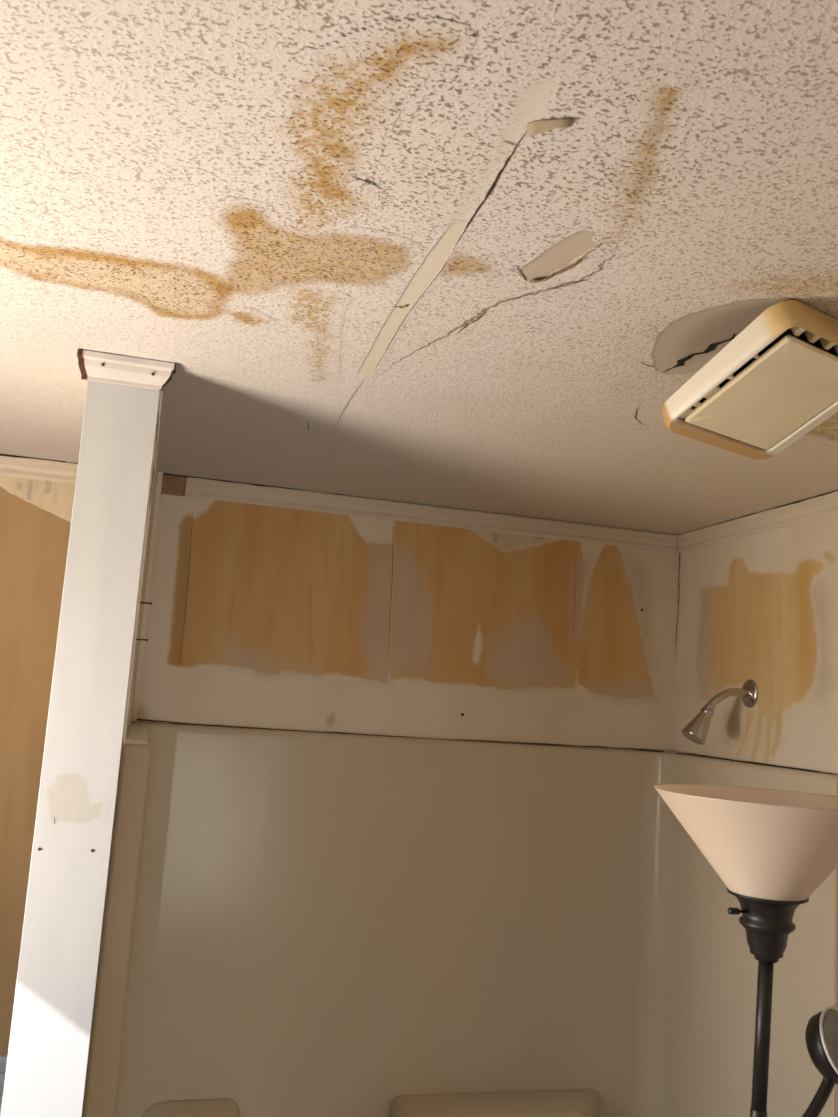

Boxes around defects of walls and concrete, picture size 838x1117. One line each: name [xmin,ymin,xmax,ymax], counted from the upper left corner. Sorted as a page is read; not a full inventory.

water stain [0,17,478,386]
water stain [591,68,704,250]
water stain [441,248,503,282]
crack [377,243,618,377]
peeling [511,228,605,284]
peeling [636,290,832,380]
water stain [801,412,838,445]